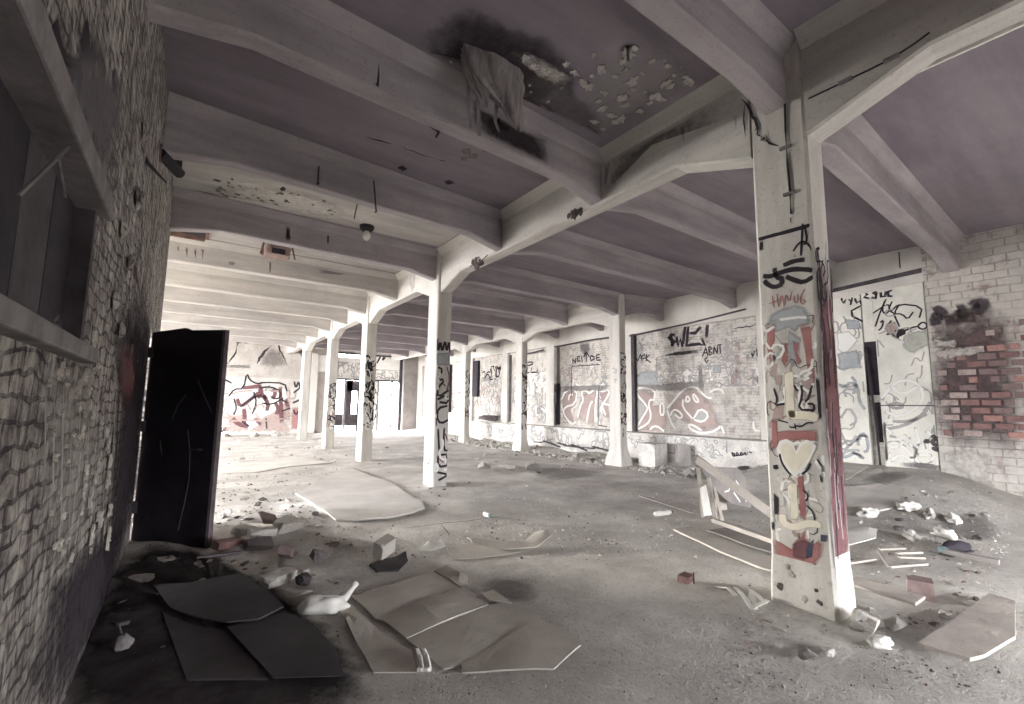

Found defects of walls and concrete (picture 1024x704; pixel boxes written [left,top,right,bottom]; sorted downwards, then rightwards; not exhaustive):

damp [532,81,597,133]
peeling [522,45,694,131]
crack [742,100,778,146]
peeling [213,178,337,215]
spalling [923,311,1024,485]
peeling [47,362,113,554]
peeling [52,536,75,563]